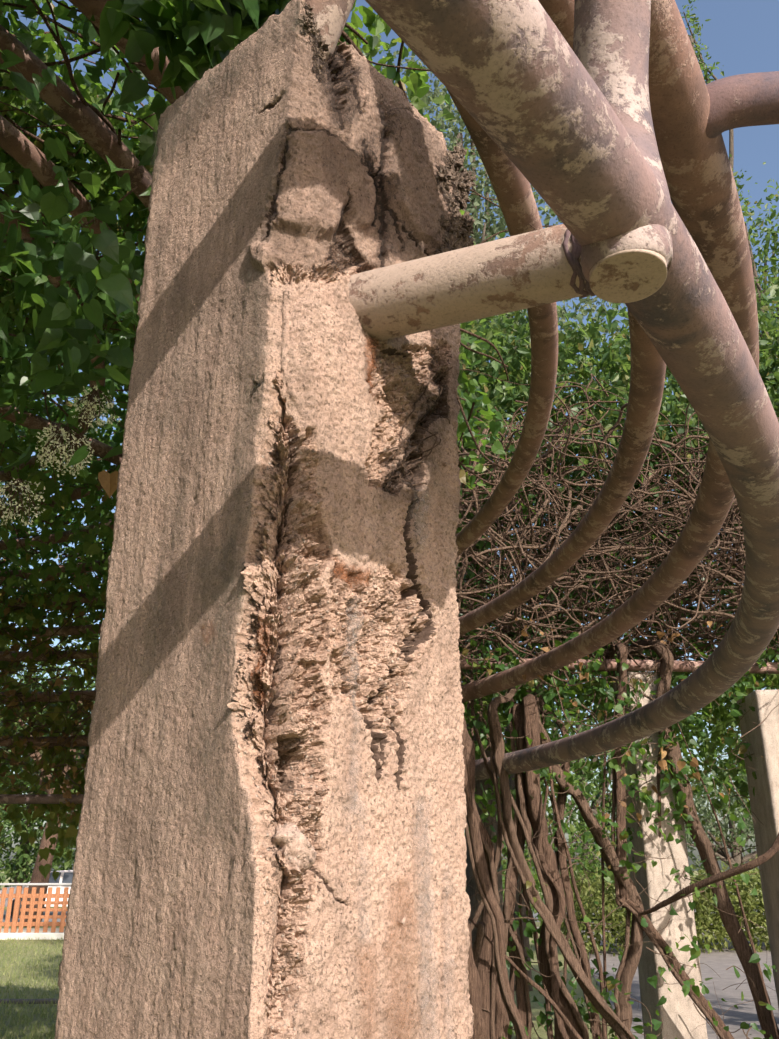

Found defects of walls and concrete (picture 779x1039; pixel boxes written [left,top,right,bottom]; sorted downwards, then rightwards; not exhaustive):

spalling [326,44,358,123]
crack [258,62,429,268]
crack [369,339,432,370]
spalling [227,247,452,1039]
crack [363,499,437,790]